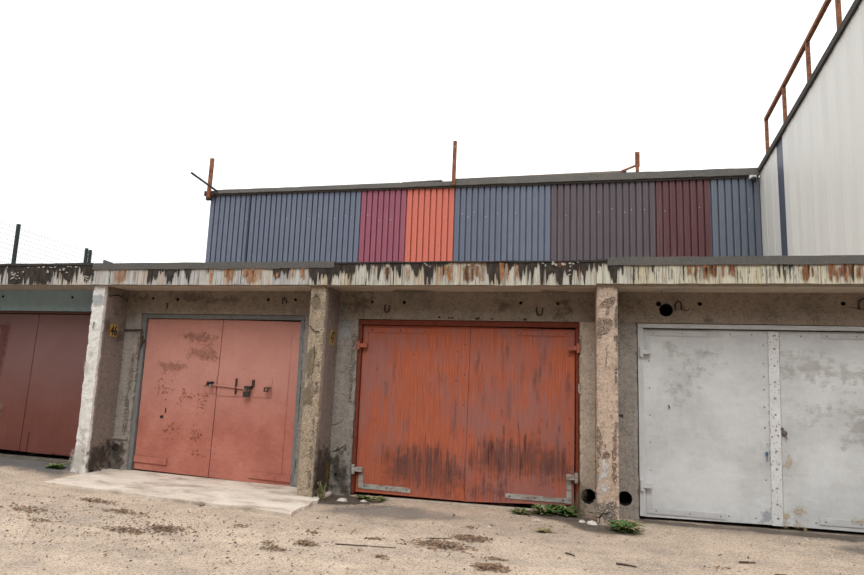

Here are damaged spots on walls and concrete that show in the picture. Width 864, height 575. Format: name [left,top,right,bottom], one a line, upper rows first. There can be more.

corrosion [209,269,261,284]
corrosion [464,263,484,282]
corrosion [687,265,735,280]
corrosion [828,264,862,282]